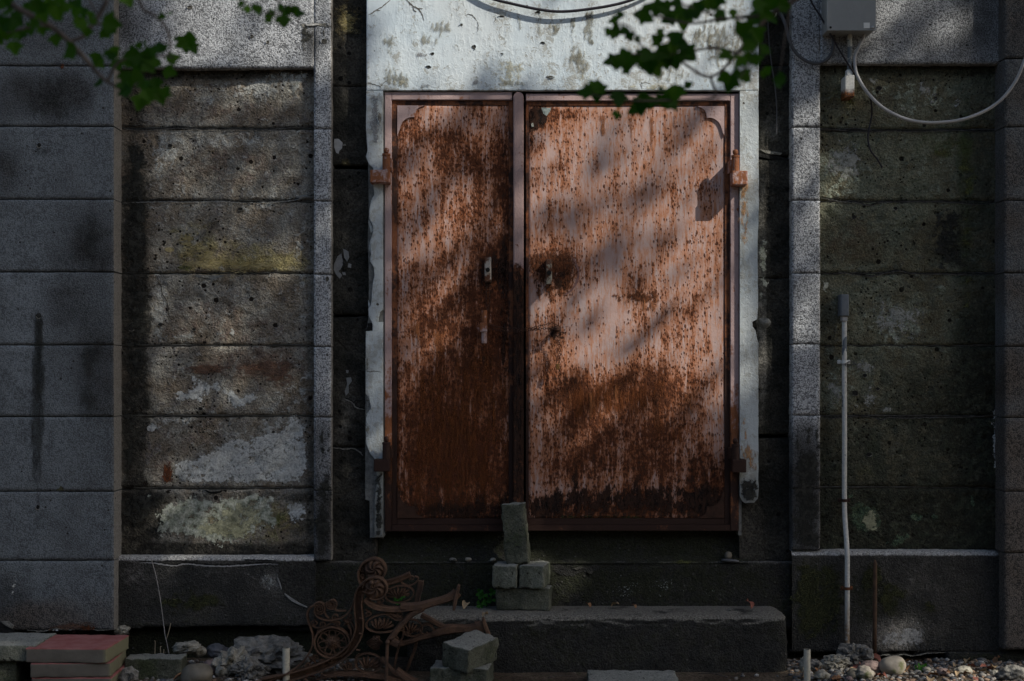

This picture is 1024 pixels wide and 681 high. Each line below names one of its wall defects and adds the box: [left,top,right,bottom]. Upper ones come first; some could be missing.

rust [530,107,553,152]
rust [529,246,579,309]
rust [612,288,659,310]
damp [32,313,44,465]
damp [175,415,307,484]
rust [525,452,725,519]